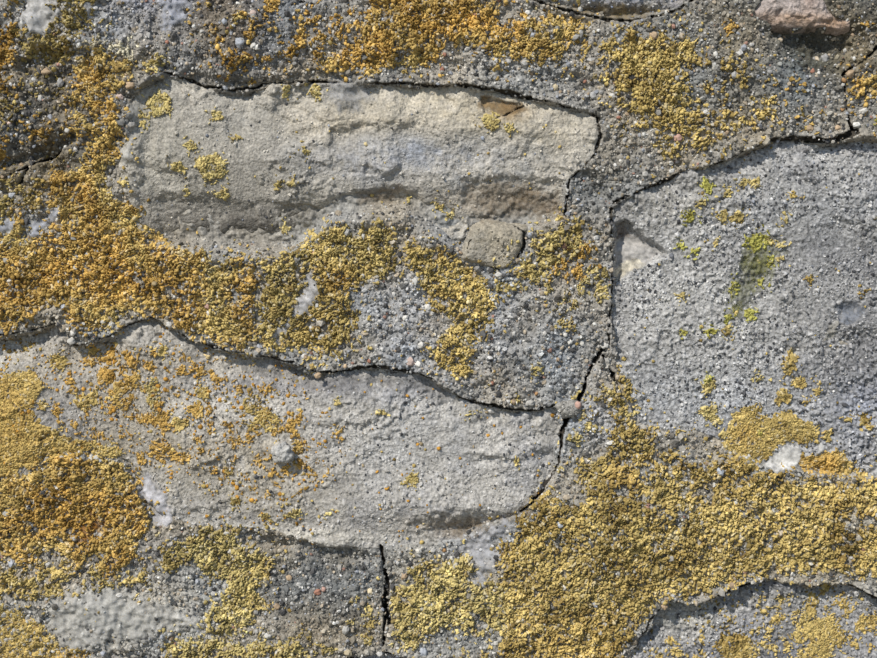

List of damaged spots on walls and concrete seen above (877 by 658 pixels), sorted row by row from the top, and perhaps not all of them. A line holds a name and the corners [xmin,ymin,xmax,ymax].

crack [710,45,877,166]
crack [9,151,62,185]
crack [72,171,684,512]
crack [380,545,401,658]